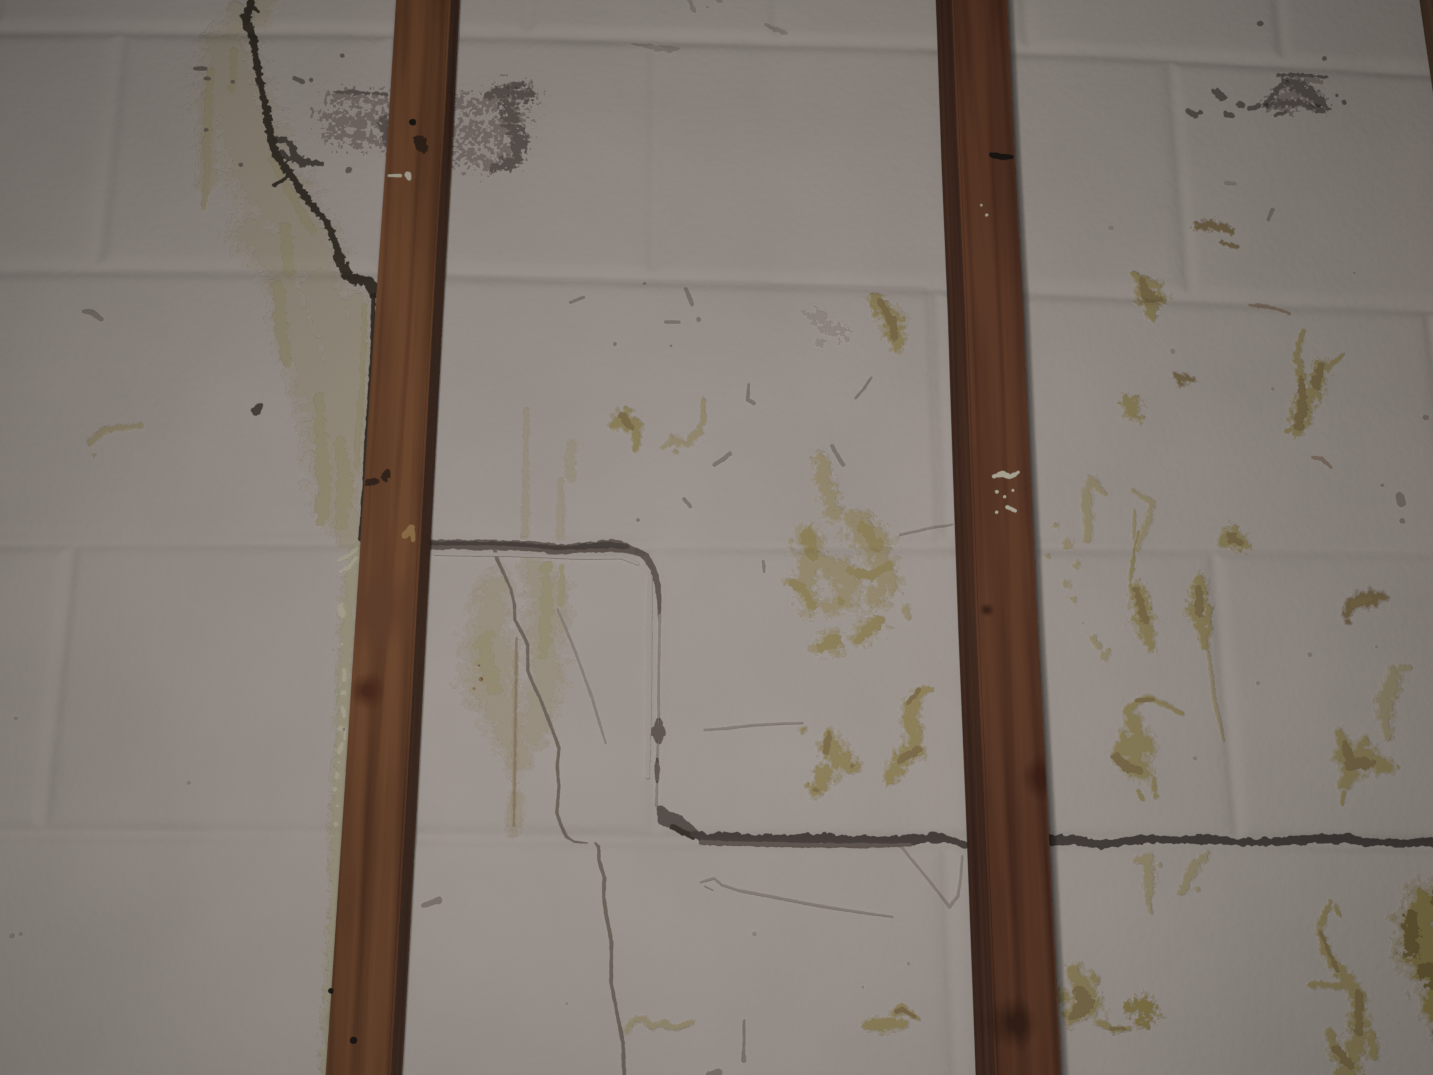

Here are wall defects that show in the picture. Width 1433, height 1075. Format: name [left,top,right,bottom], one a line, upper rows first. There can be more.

crack [239,0,377,541]
damp [178,0,376,1075]
damp [781,449,912,661]
crack [430,539,666,1075]
crack [704,722,803,731]
crack [690,831,967,917]
damp [881,684,934,791]
damp [1107,692,1185,802]
crack [1049,833,1433,850]
damp [1306,899,1381,1075]
damp [1328,663,1413,806]
damp [1384,873,1433,1042]